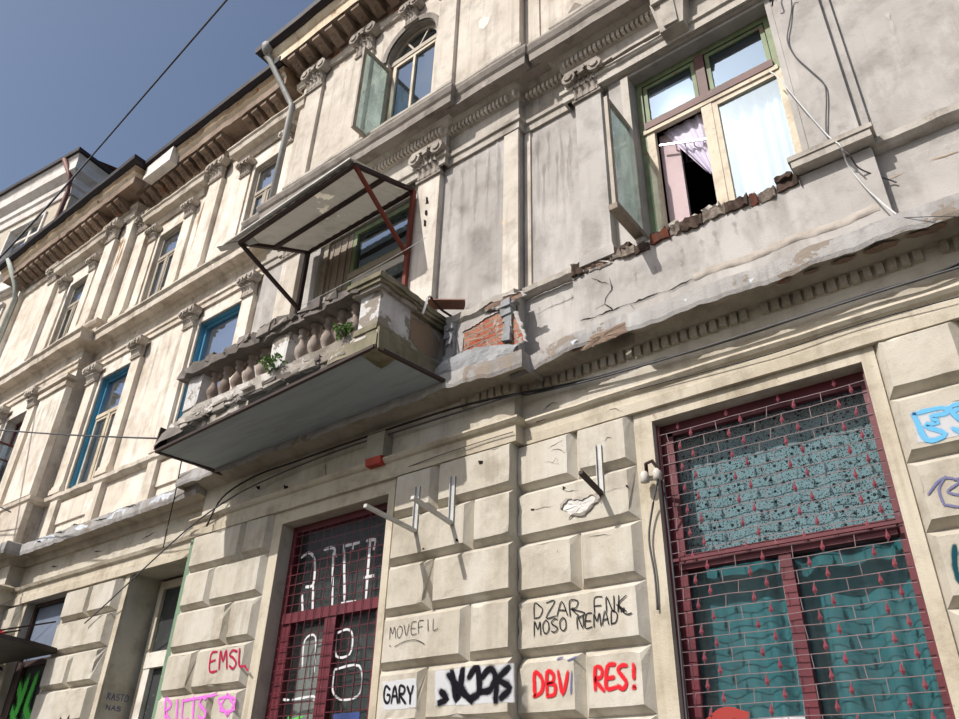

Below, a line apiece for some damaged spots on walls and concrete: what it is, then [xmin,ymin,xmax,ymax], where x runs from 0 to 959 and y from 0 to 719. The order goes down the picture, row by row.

spalling [461,291,528,352]
spalling [568,322,629,352]
crack [527,276,692,322]
spalling [560,493,601,520]